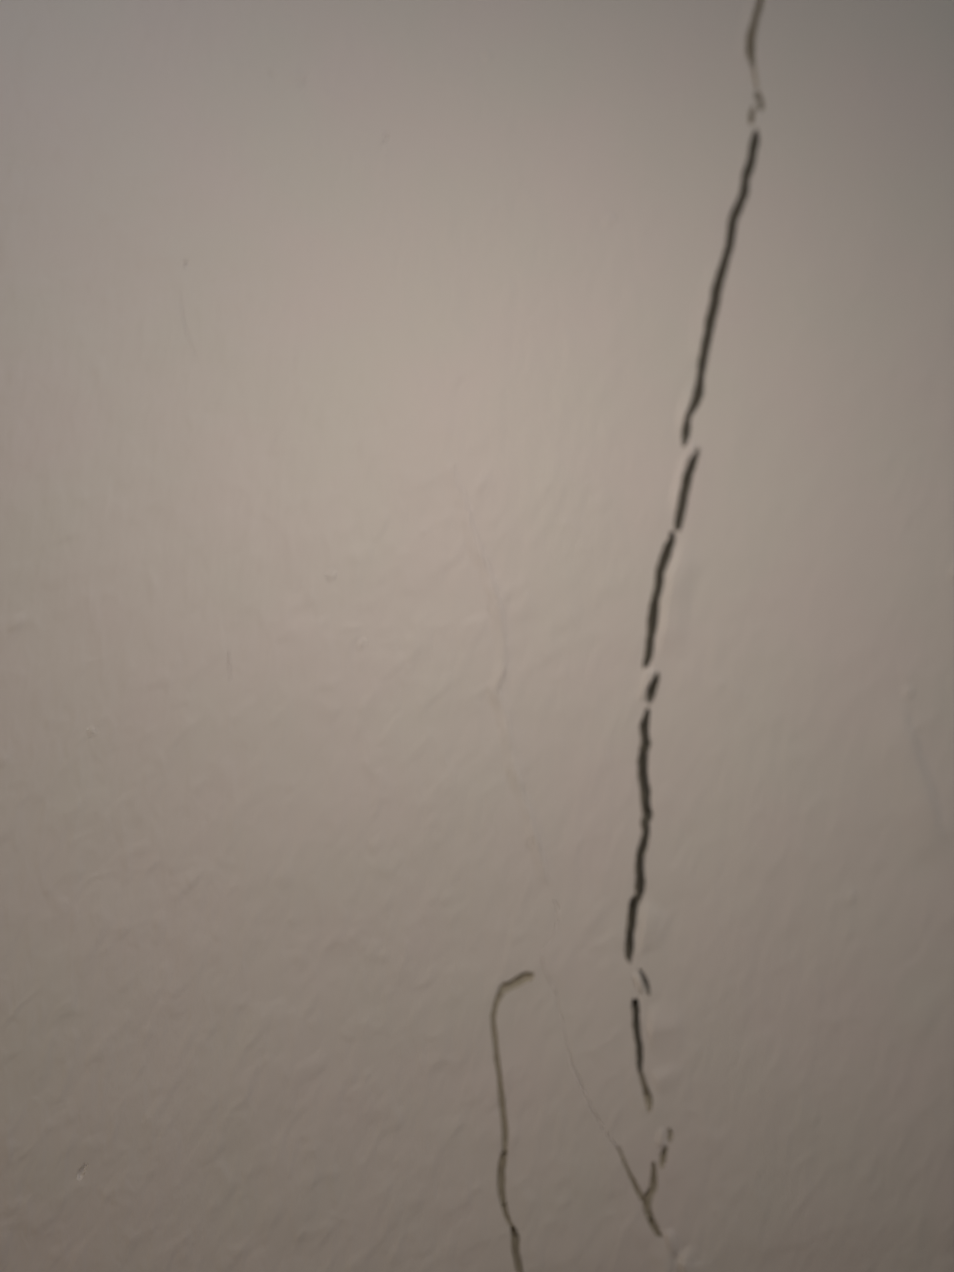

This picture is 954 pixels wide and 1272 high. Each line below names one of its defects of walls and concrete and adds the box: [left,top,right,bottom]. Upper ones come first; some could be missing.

crack [491,972,534,1272]
crack [617,0,764,1237]